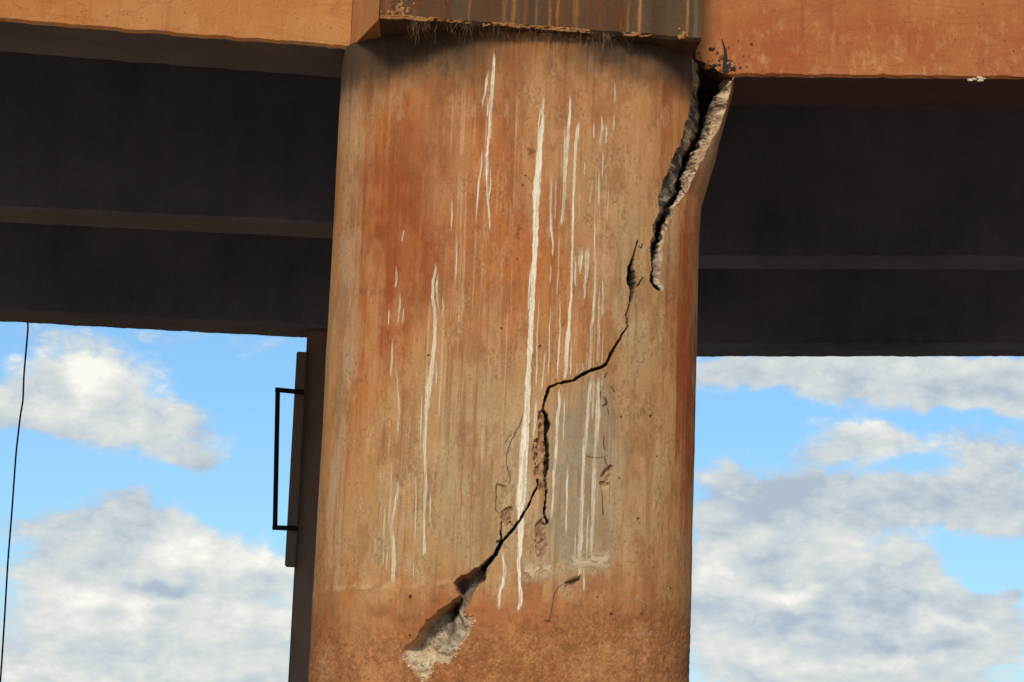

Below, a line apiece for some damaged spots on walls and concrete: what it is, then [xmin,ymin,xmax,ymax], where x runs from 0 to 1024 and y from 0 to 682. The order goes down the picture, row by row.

corrosion [380,0,601,33]
corrosion [619,0,652,37]
efflorescence [476,55,495,228]
efflorescence [414,268,444,554]
spalling [531,411,545,493]
damp [498,100,608,609]
crack [480,39,729,572]
corrosion [677,269,695,455]
efflorescence [375,472,399,581]
spalling [401,558,489,682]
spalling [523,517,554,580]
flaking render [565,550,610,587]